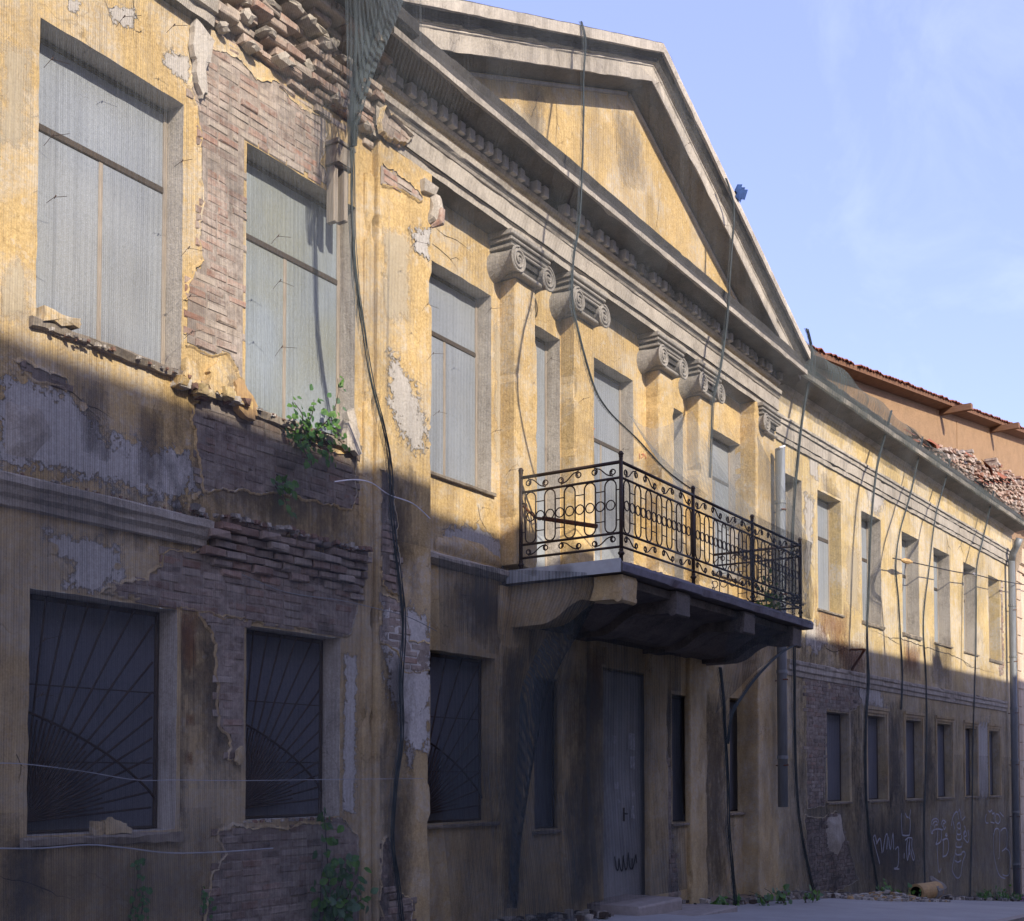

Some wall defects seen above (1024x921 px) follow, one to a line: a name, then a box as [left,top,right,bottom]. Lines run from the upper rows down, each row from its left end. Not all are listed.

peeling [105,0,143,32]
spalling [162,47,328,389]
peeling [408,225,431,261]
spalling [0,356,361,512]
peeling [385,345,431,457]
peeling [40,526,126,595]
spalling [196,611,251,762]
peeling [379,468,430,769]
spalling [199,653,360,921]
spalling [803,678,887,892]